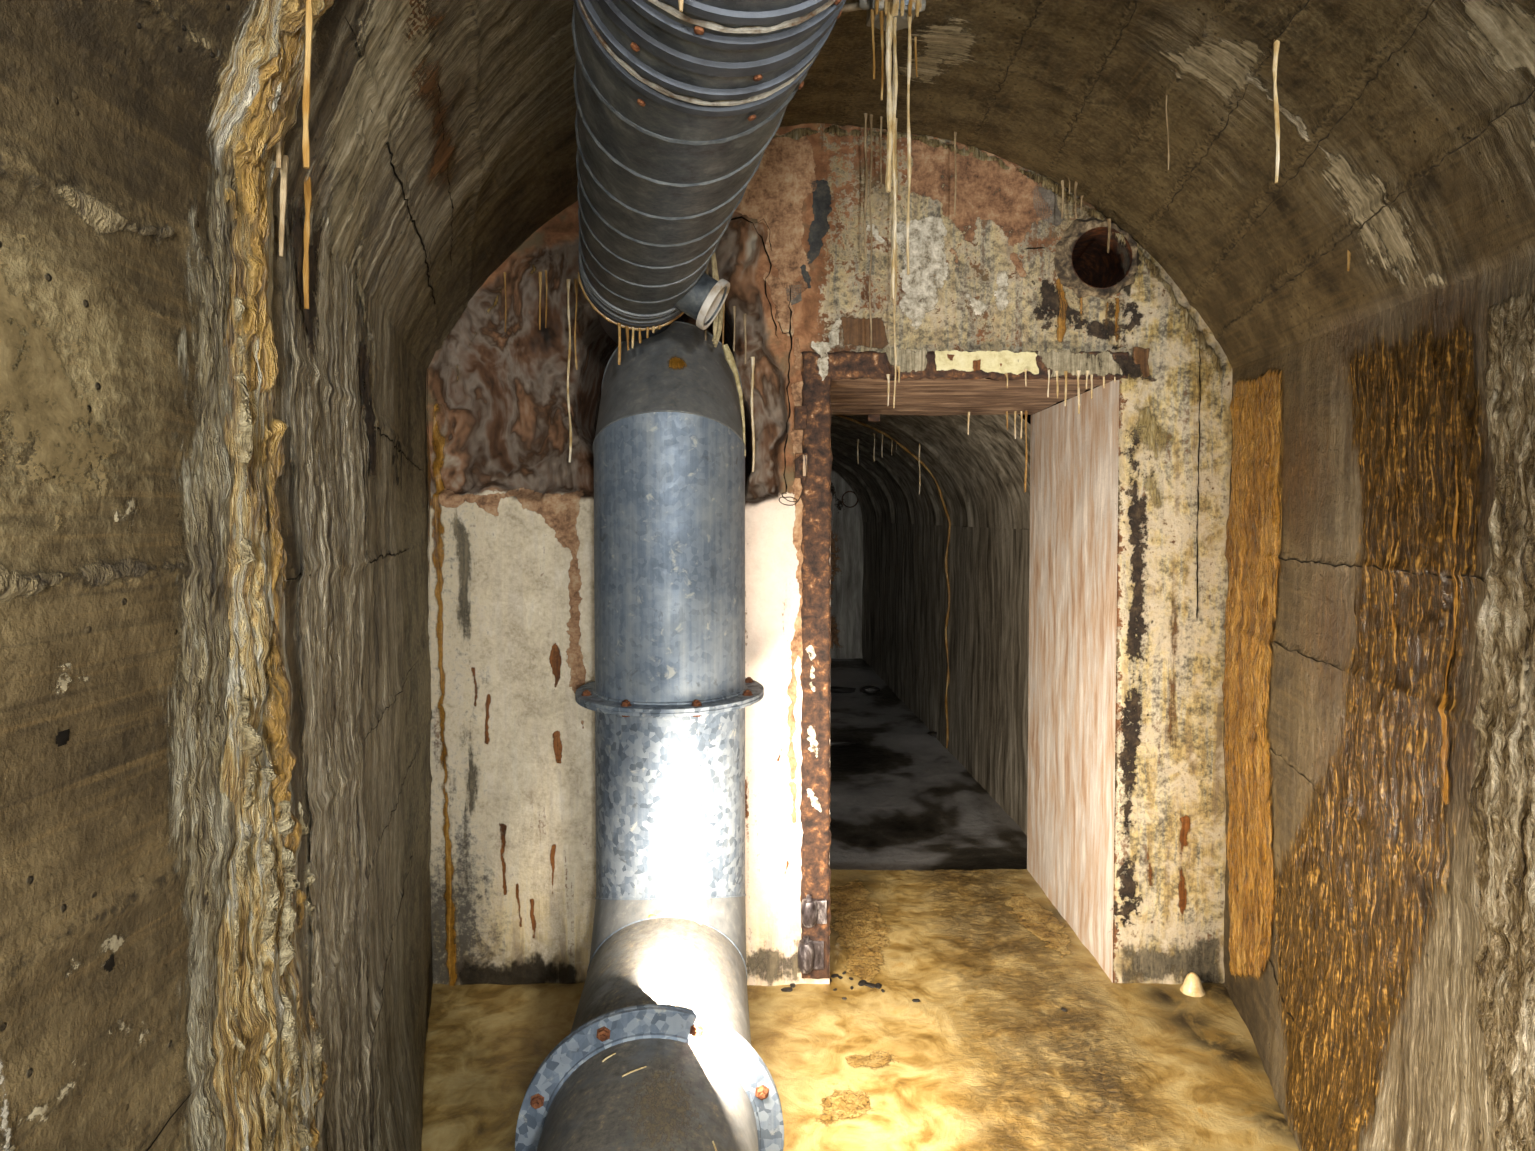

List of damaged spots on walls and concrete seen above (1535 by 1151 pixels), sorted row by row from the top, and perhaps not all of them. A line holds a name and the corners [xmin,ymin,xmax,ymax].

peeling [866,139,1053,330]
rust [669,356,687,370]
peeling [935,350,1039,375]
rust [471,667,491,744]
rust [499,823,536,938]
crack [146,1093,192,1151]